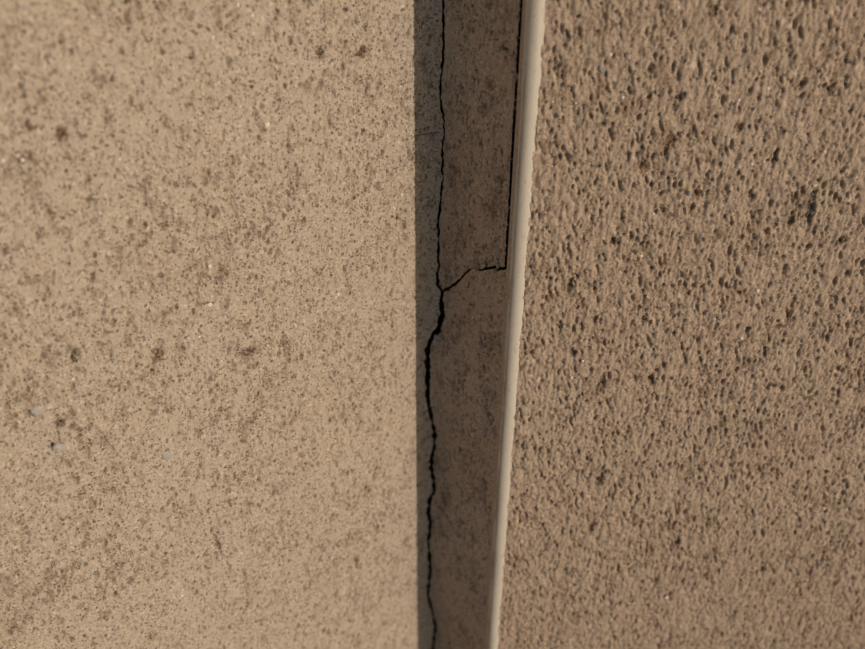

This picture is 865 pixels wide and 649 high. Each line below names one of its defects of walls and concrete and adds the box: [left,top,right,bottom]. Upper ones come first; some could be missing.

crack [412,0,505,649]